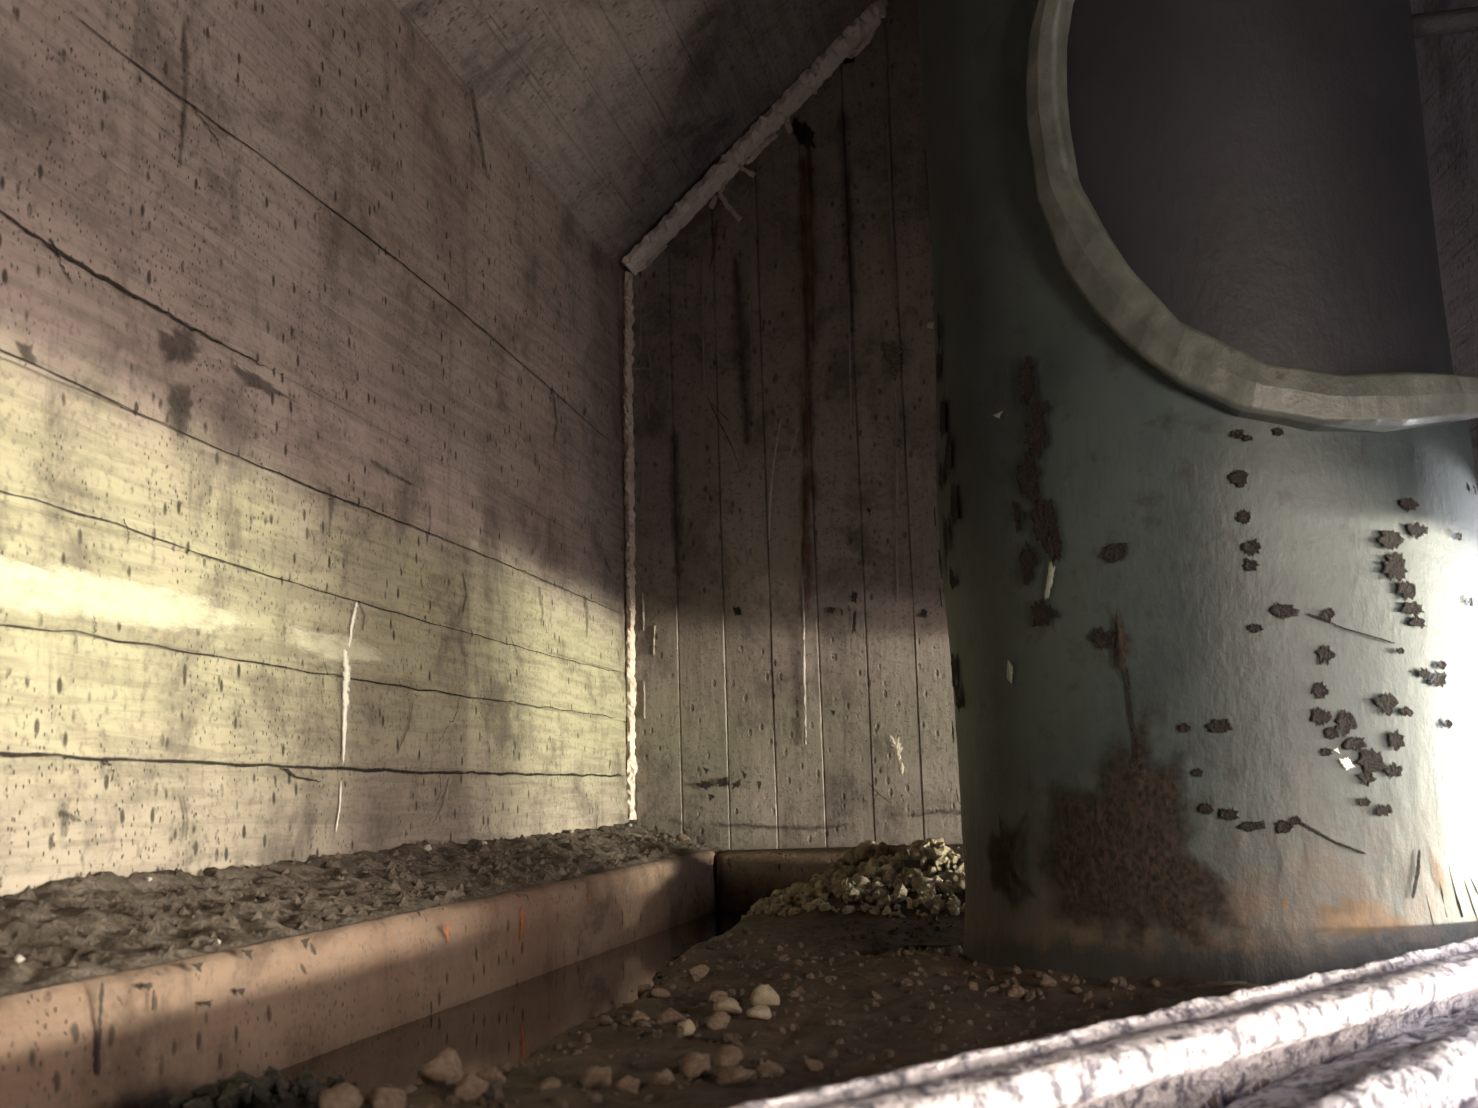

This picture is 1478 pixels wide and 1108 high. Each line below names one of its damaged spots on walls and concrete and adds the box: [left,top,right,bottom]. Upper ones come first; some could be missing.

peeling [1231,429,1253,441]
peeling [1012,356,1063,627]
peeling [1229,470,1249,488]
peeling [1102,543,1128,563]
peeling [1237,508,1261,572]
peeling [1378,498,1428,629]
peeling [1248,602,1300,633]
peeling [1320,607,1335,624]
peeling [1416,660,1448,687]
peeling [1179,718,1234,733]
peeling [1311,644,1414,816]
peeling [1199,802,1302,834]